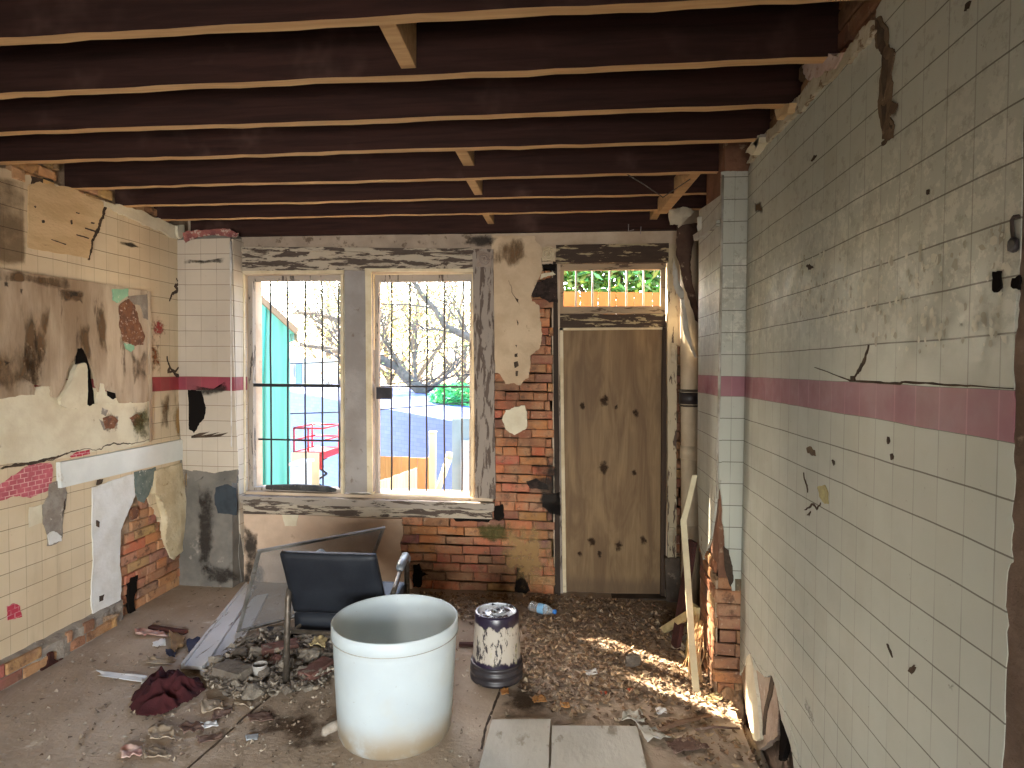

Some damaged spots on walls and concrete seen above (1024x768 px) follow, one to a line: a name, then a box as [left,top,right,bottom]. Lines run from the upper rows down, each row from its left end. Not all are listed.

spalling [745,0,882,164]
crack [88,207,107,260]
peeling [112,288,148,320]
crack [814,345,1014,389]
flaking render [0,380,149,464]
spalling [193,469,239,483]
flaking render [401,296,555,594]
damp [199,493,237,583]
flaking render [0,498,180,692]